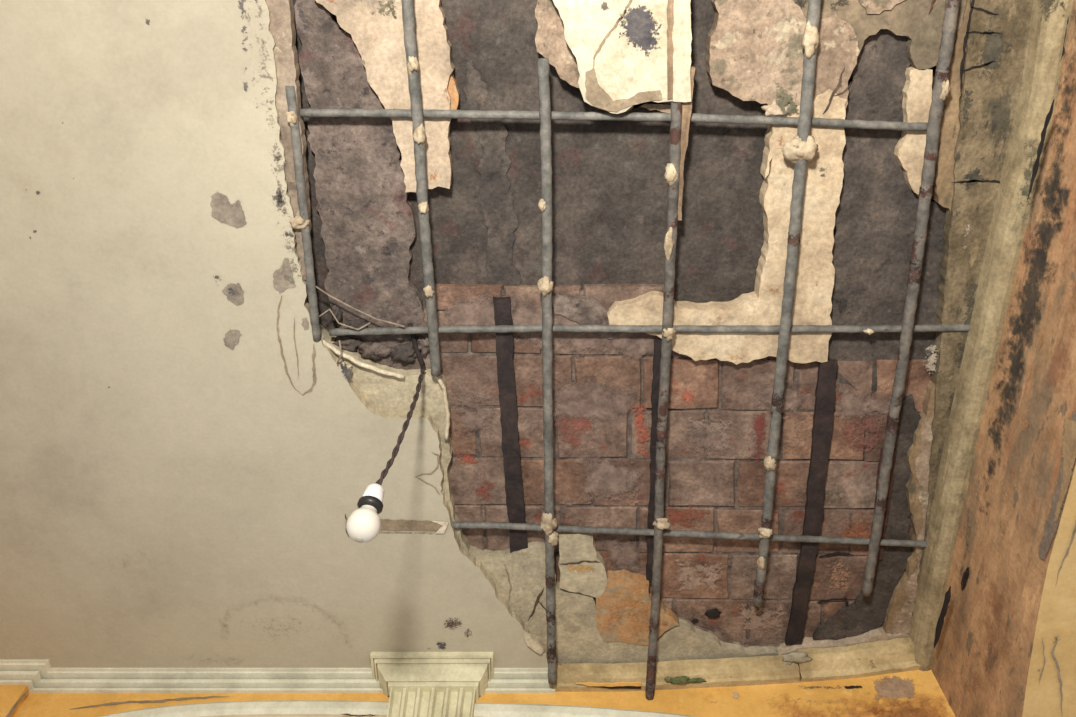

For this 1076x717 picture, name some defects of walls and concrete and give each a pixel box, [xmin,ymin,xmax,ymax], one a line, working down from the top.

leakage [372,0,397,19]
leakage [976,29,1011,77]
leakage [964,157,984,191]
leakage [979,55,1076,513]
crack [277,296,317,395]
spalling [238,0,971,664]
leakage [922,345,940,374]
leakage [955,283,978,367]
crack [1055,522,1076,586]
rust [547,644,556,666]
rust [645,653,657,698]
crack [1039,638,1063,713]